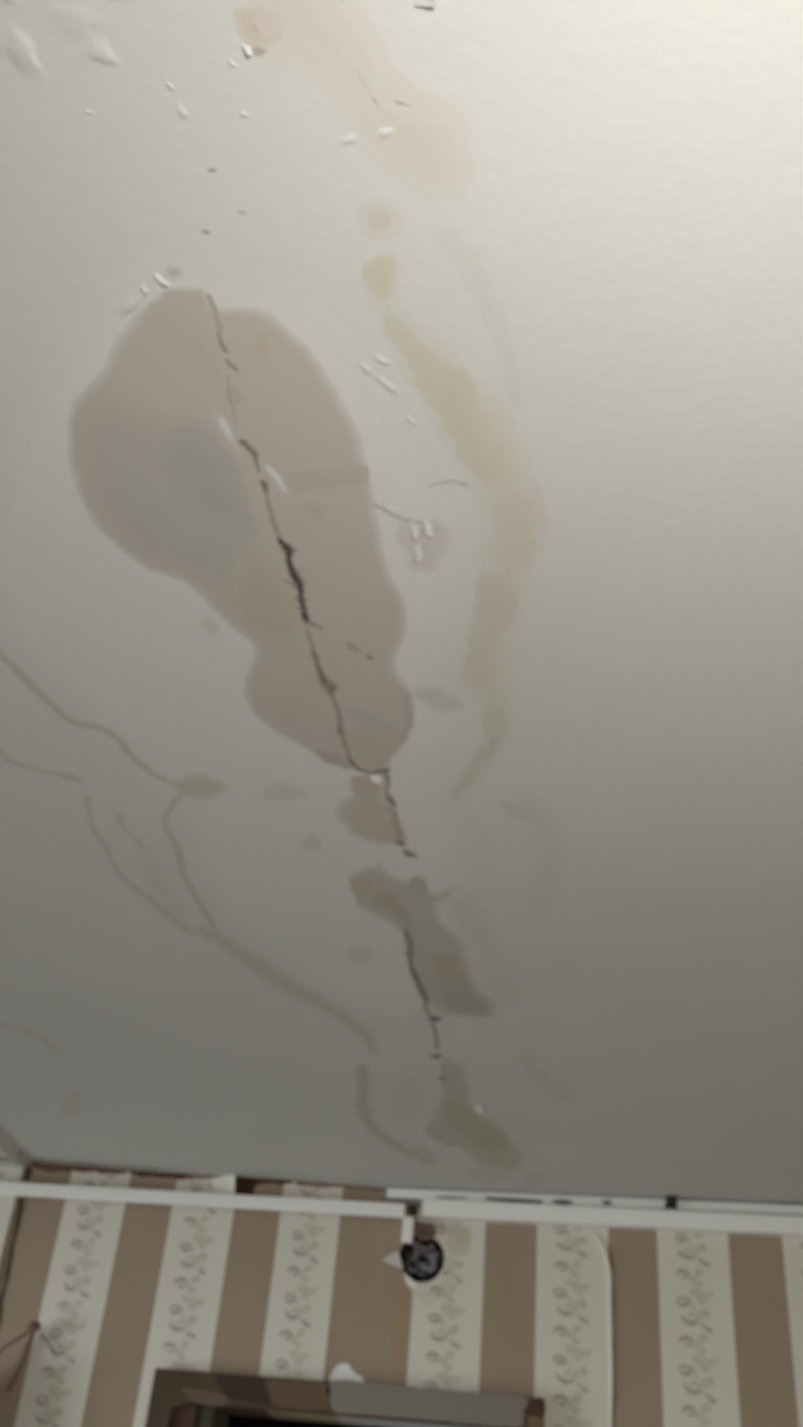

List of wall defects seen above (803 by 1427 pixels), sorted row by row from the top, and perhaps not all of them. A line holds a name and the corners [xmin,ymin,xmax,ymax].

water stain [0,229,550,1184]
crack [205,293,424,858]
crack [402,930,448,1081]